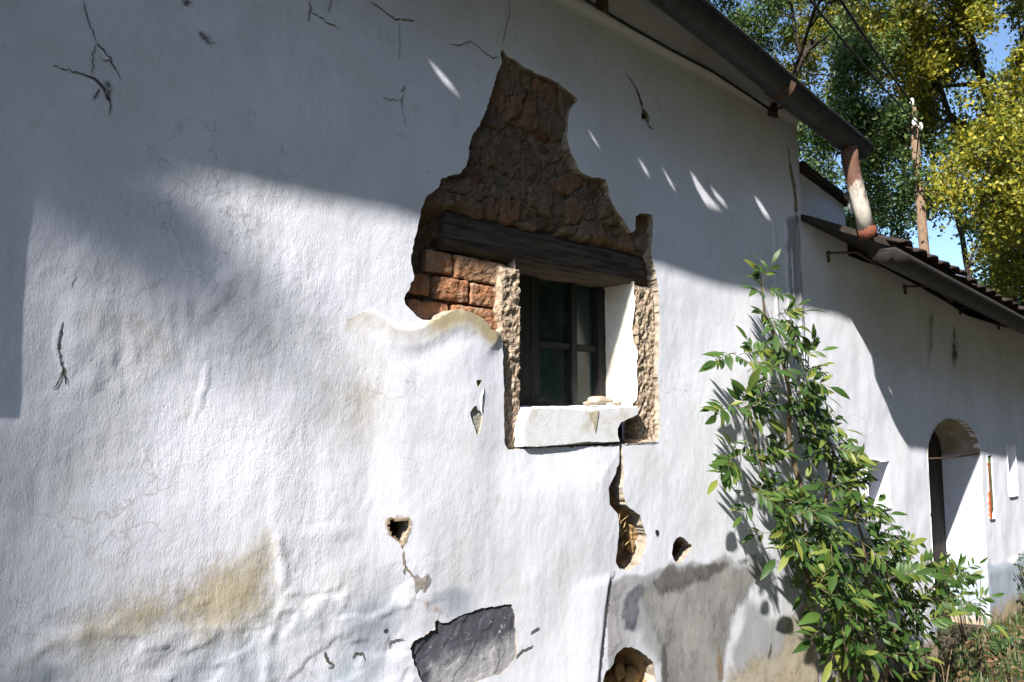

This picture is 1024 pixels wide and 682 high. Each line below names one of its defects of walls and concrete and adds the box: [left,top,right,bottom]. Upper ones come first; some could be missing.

crack [53,2,120,111]
crack [308,1,337,28]
crack [449,6,510,59]
crack [382,86,407,127]
crack [627,74,652,129]
flaking render [404,55,656,449]
crack [51,320,67,388]
damp [176,557,266,626]
flaking render [385,515,540,682]
flaking render [653,540,724,594]
damp [642,558,818,682]
flaking render [603,647,647,682]